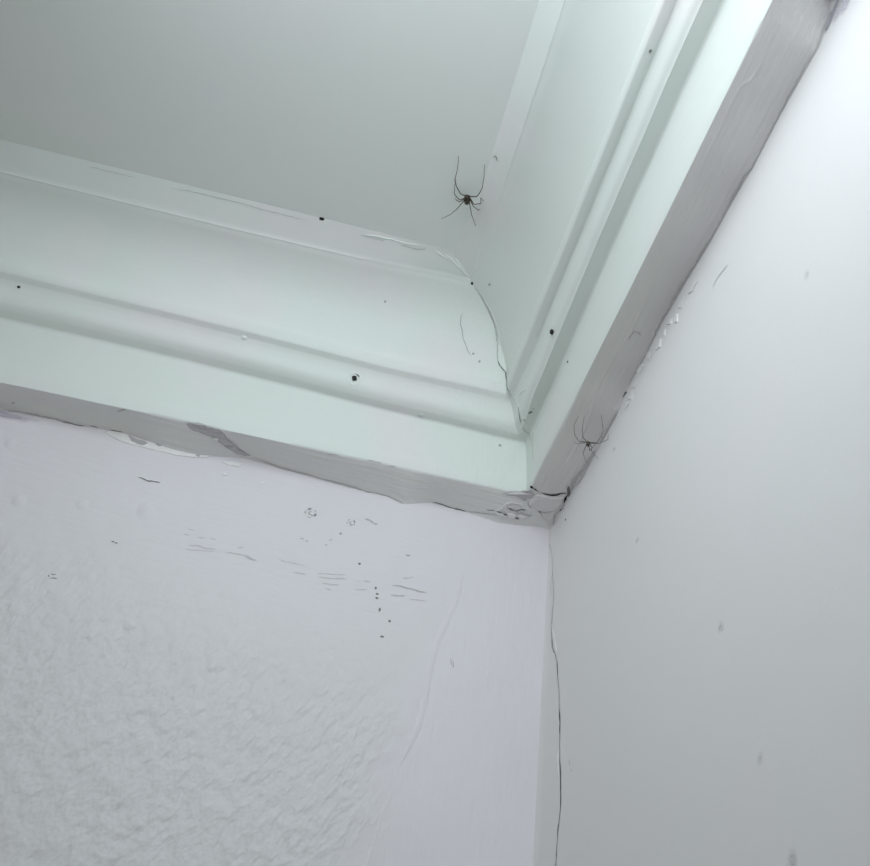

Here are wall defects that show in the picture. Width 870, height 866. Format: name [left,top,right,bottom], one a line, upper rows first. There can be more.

crack [528,11,832,524]
peeling [186,422,248,455]
crack [474,287,533,447]
peeling [493,490,564,520]
crack [548,545,559,688]
crack [554,712,562,866]